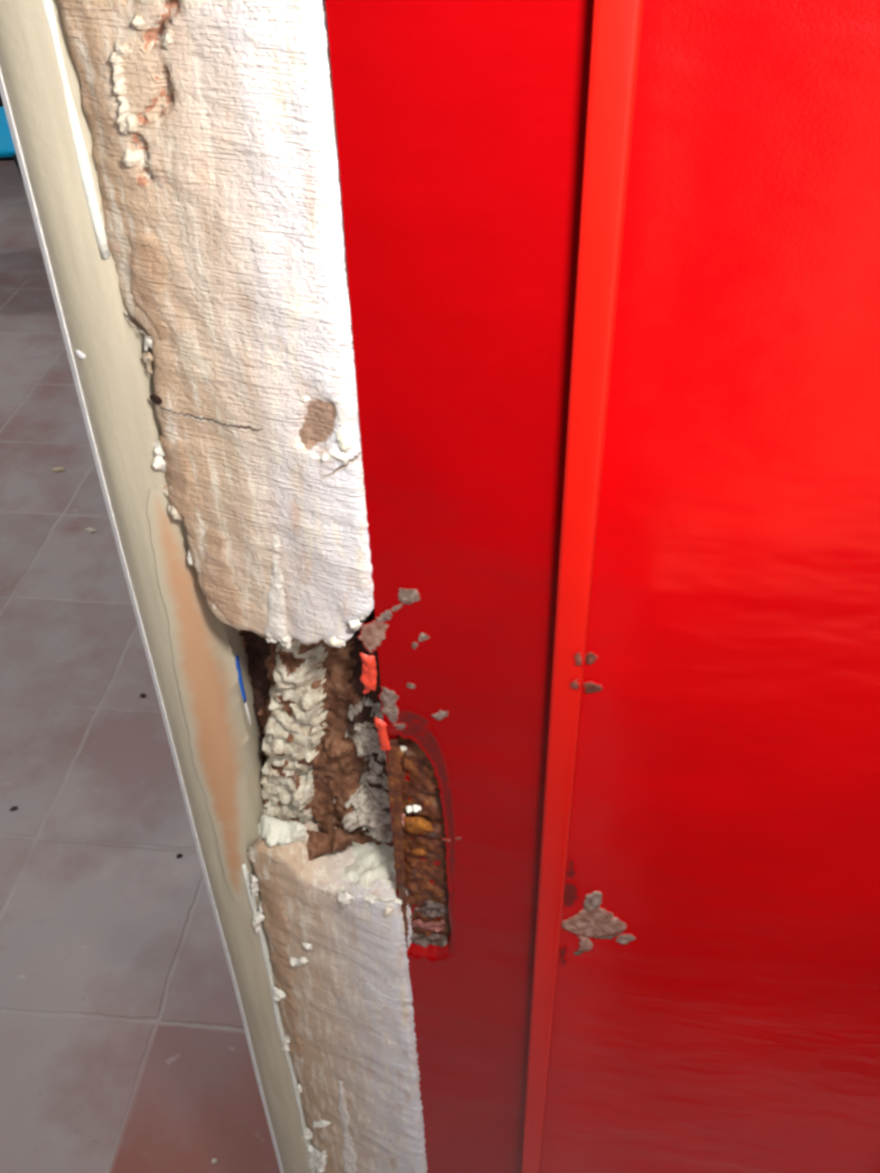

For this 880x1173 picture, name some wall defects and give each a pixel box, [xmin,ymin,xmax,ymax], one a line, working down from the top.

crack [161,407,263,433]
spalling [295,395,353,464]
spalling [152,441,182,521]
crack [321,452,361,479]
peeling [411,632,432,650]
peeling [430,709,450,721]
spalling [239,587,422,934]
corrosion [385,708,459,948]
peeling [562,889,637,955]
peeling [289,942,313,967]
peeling [273,987,286,1002]
peeling [301,1120,331,1173]